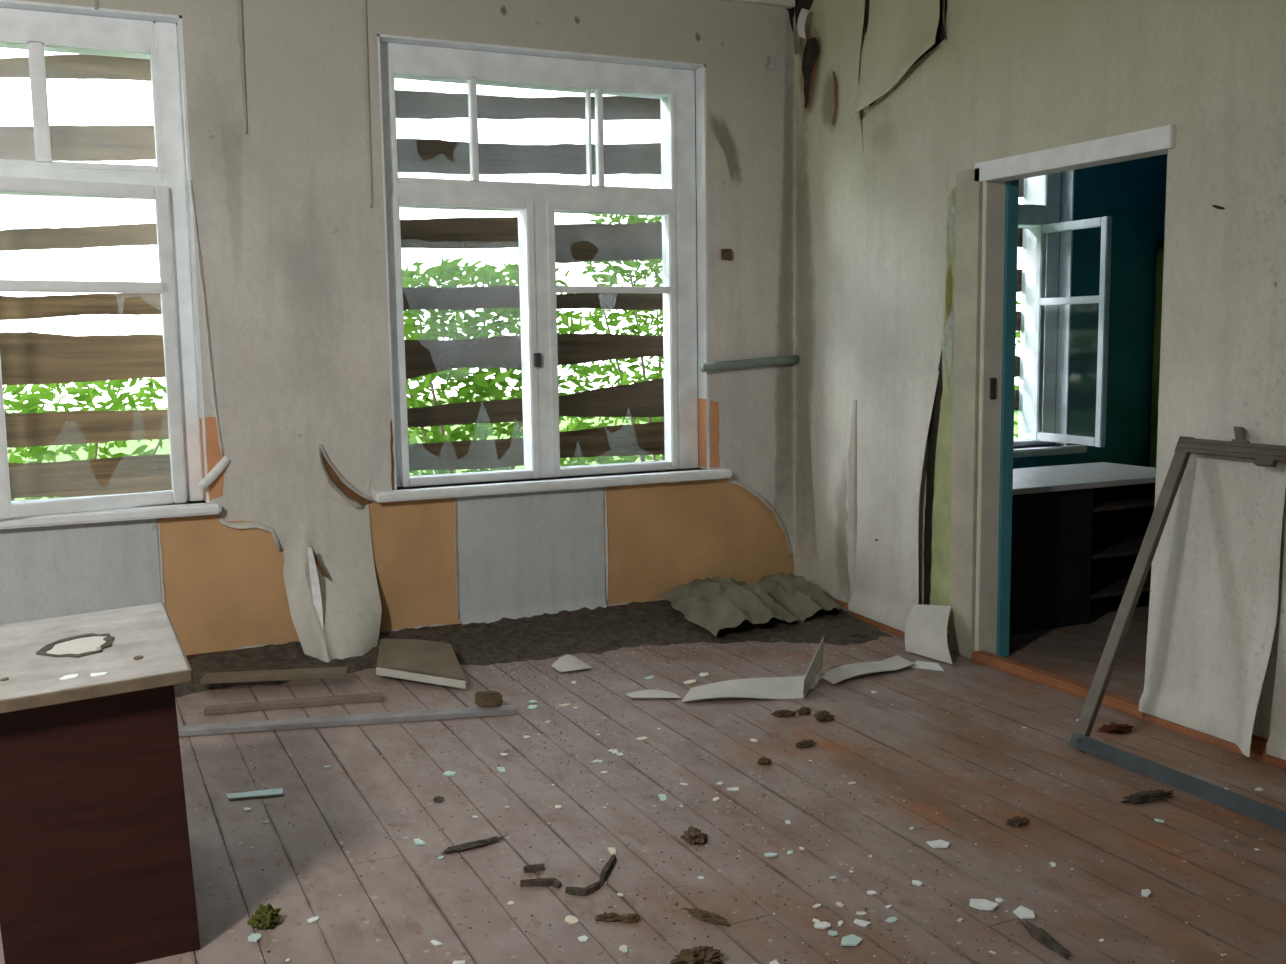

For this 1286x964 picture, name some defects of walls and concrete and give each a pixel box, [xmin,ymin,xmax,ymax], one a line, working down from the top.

spalling [794,0,818,108]
peeling [850,0,947,119]
peeling [368,420,459,632]
peeling [604,398,794,605]
peeling [930,186,956,629]